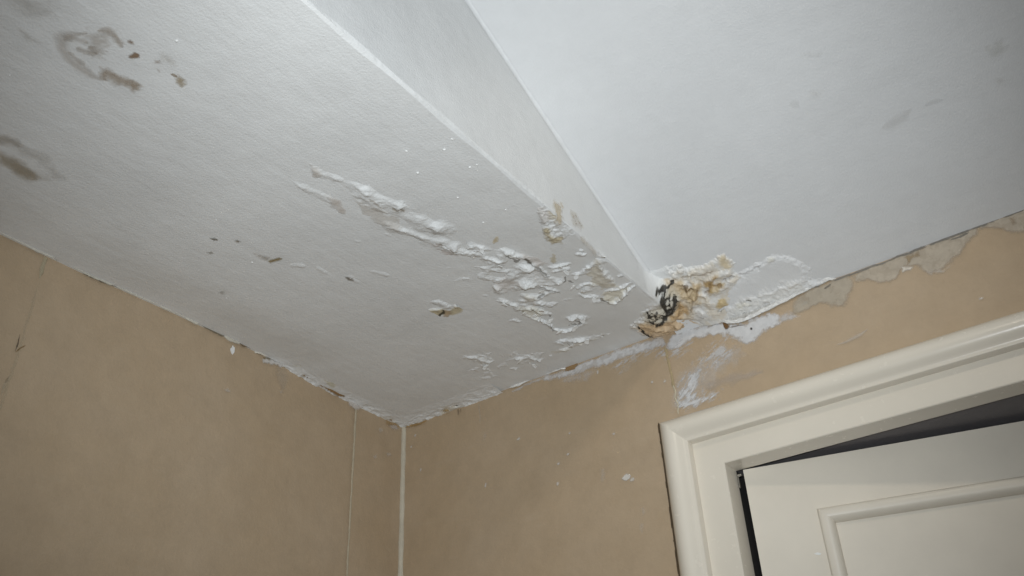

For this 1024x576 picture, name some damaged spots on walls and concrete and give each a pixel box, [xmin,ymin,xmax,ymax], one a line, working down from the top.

peeling [289,163,474,283]
spalling [428,299,463,317]
mould [638,280,679,337]
flaking render [629,253,836,339]